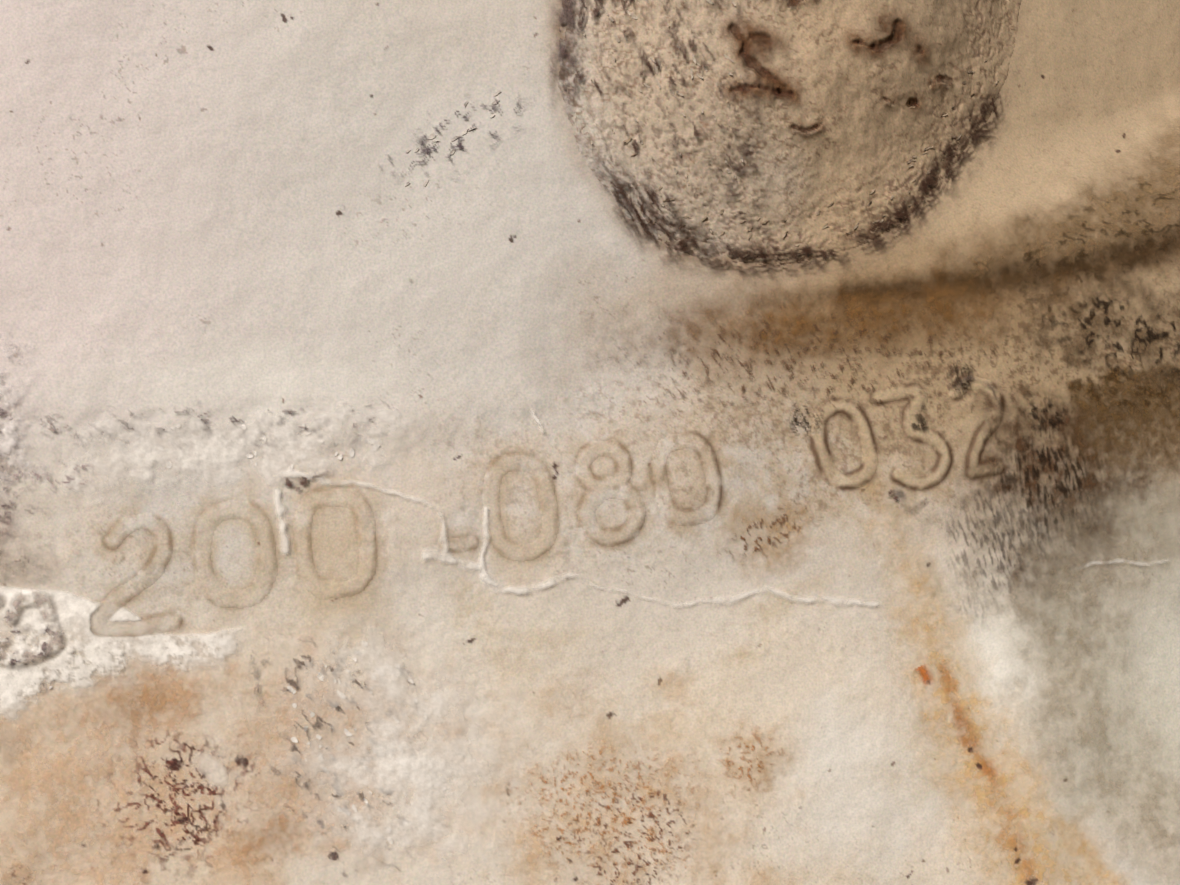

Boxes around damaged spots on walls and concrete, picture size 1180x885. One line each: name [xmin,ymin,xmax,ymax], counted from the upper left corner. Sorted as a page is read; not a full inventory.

damp [683,135,1180,605]
crack [275,471,321,552]
crack [423,507,572,594]
crack [732,591,876,605]
rust [4,669,266,885]
rust [557,768,690,885]
rust [918,654,1029,819]
rust [987,834,1070,885]